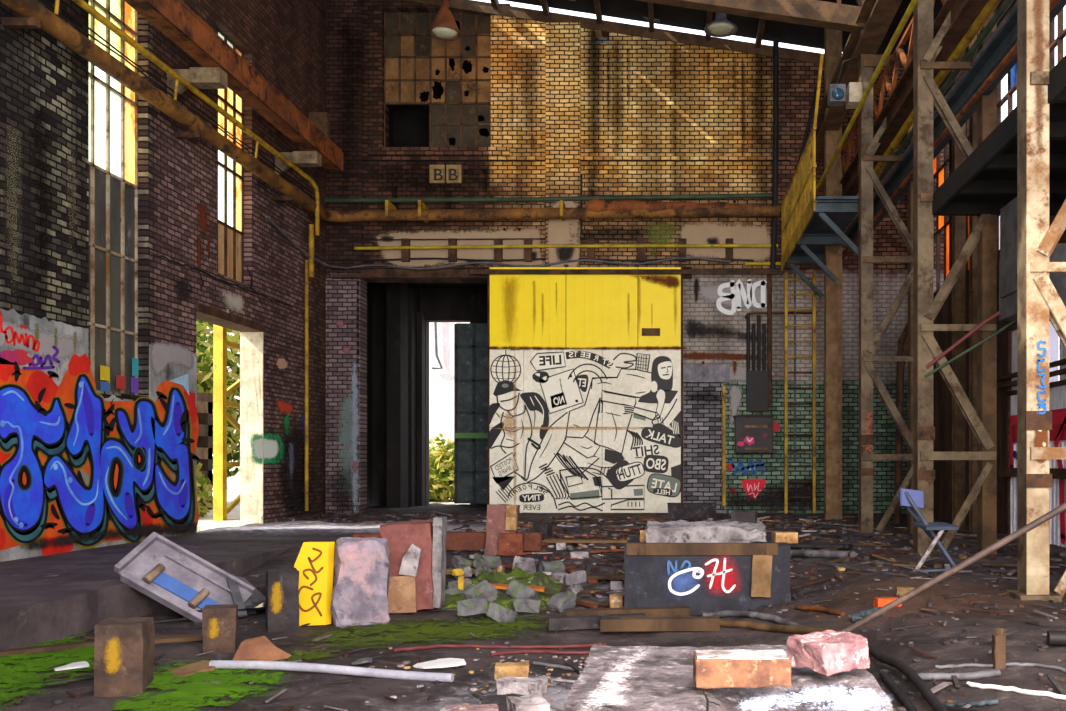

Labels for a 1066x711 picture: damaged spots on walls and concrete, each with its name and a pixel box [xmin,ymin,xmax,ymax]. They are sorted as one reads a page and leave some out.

damp [588,29,630,196]
damp [734,55,767,168]
flaking render [377,201,580,267]
flaking render [680,222,771,262]